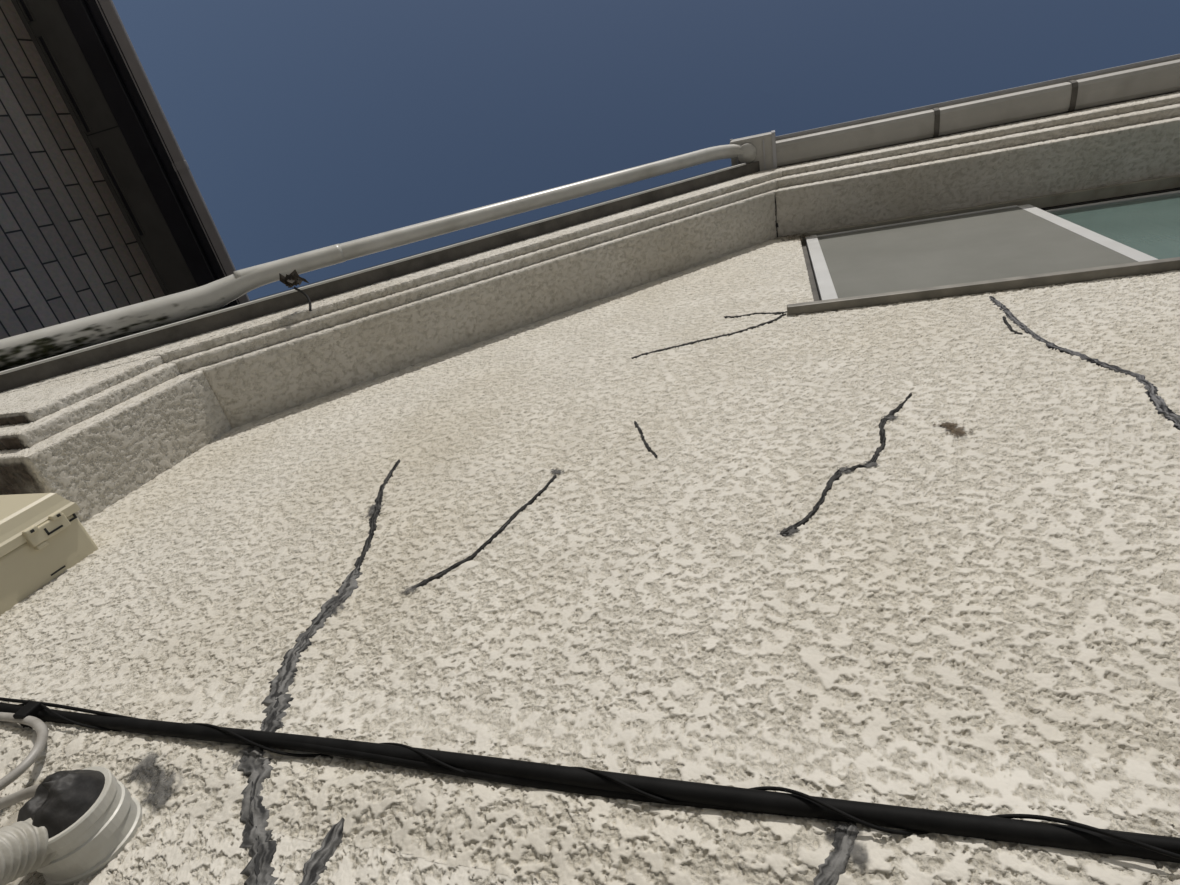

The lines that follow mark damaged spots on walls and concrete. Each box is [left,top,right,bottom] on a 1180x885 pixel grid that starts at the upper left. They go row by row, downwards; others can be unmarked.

crack [631,311,787,359]
crack [989,296,1180,430]
crack [634,421,658,458]
crack [777,393,912,536]
crack [404,469,564,595]
crack [232,459,400,885]
crack [813,821,868,885]